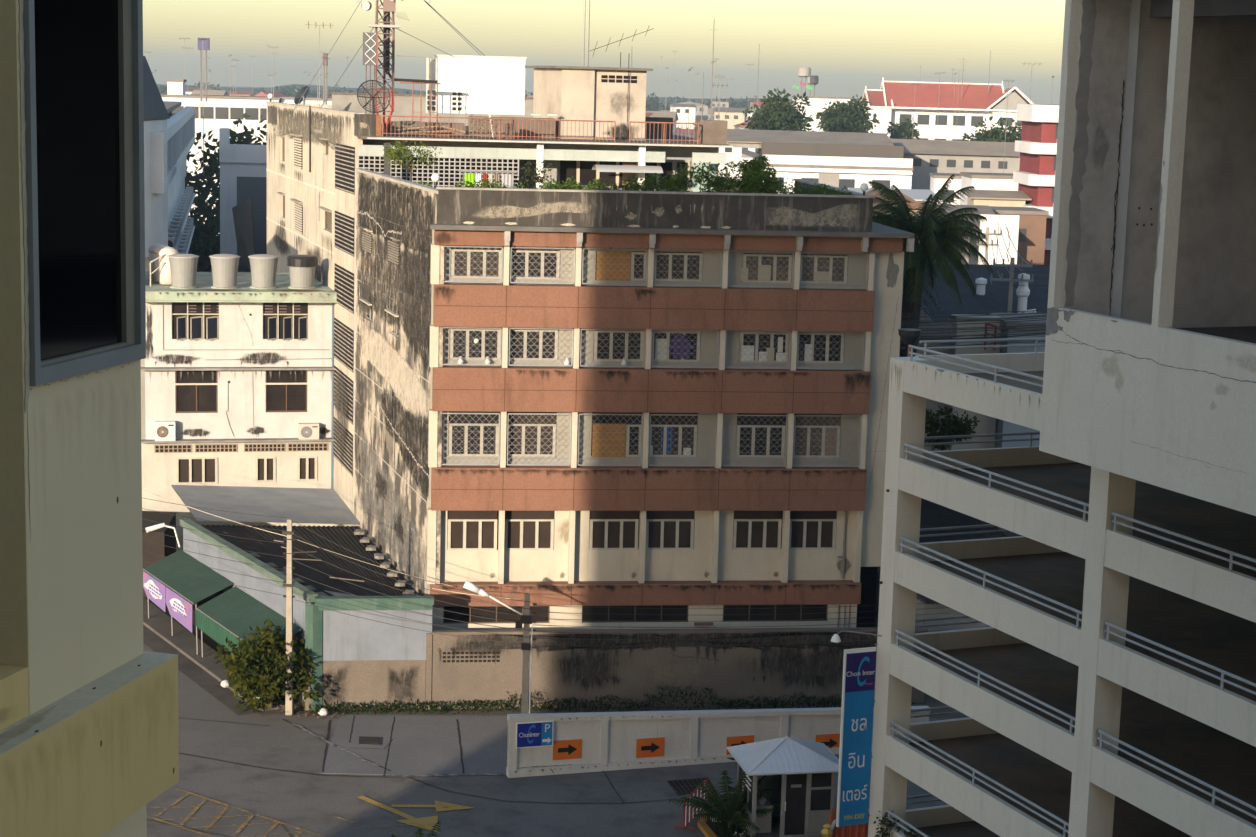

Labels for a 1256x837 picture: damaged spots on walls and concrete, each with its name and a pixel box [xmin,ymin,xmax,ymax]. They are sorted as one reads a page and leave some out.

damp [358,176,450,371]
crack [1109,80,1125,316]
crack [1053,330,1256,383]
damp [439,632,877,688]